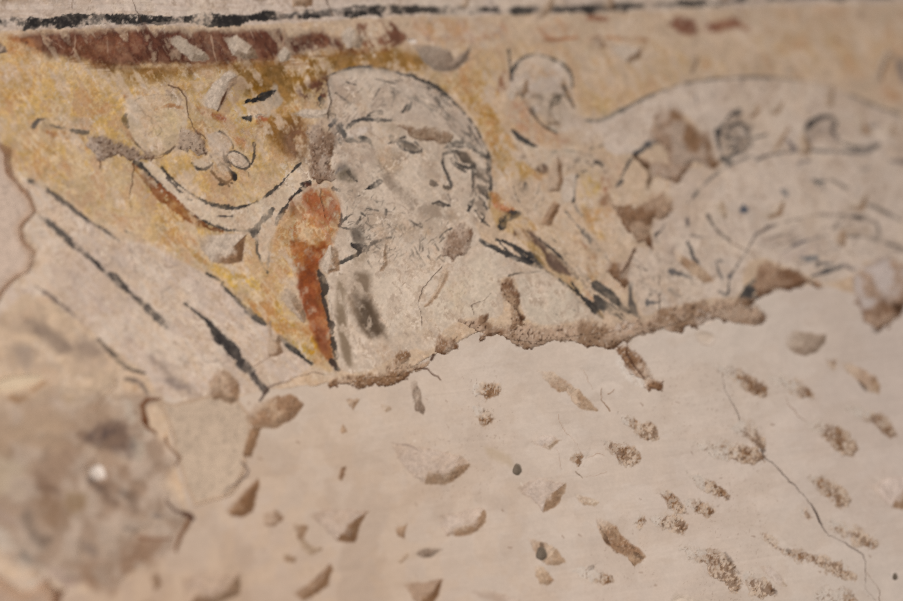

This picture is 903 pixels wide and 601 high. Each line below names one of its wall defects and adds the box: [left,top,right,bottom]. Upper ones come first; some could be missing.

crack [0,142,37,300]
flaking render [604,107,721,289]
flaking render [328,333,459,390]
flaking render [458,258,824,392]
flaking render [851,256,903,331]
crack [45,575,67,601]
crack [761,449,881,601]